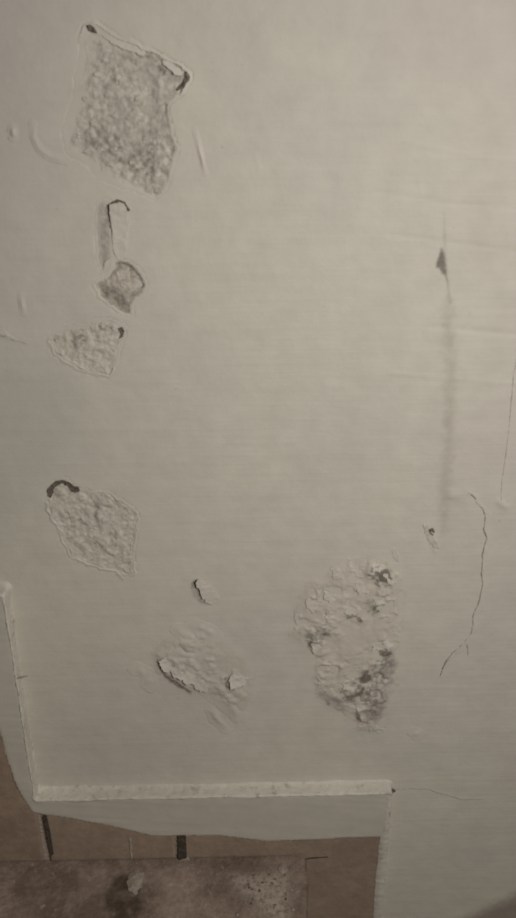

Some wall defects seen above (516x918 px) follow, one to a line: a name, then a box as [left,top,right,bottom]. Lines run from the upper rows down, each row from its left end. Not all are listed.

spalling [28,18,193,379]
spalling [44,477,141,581]
crack [440,364,516,677]